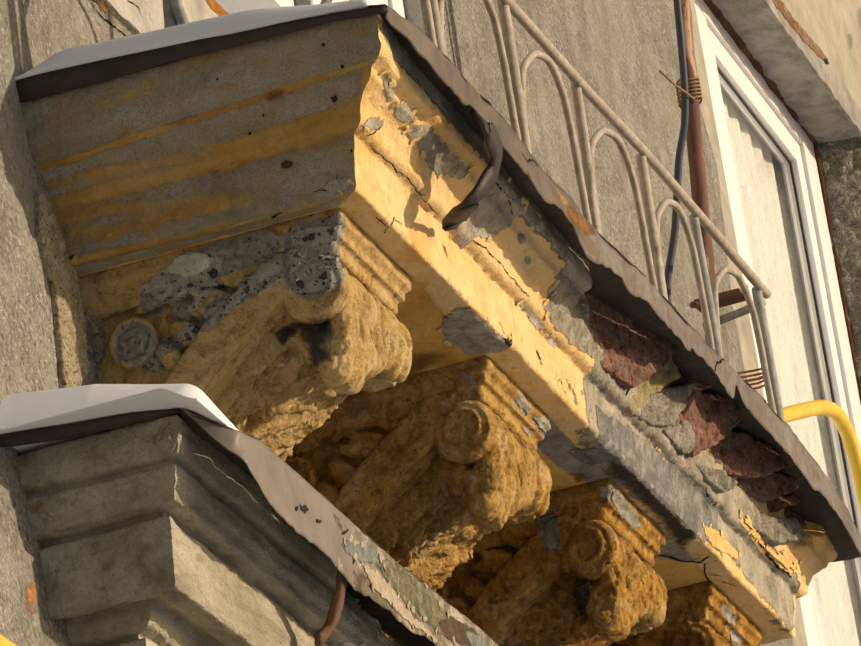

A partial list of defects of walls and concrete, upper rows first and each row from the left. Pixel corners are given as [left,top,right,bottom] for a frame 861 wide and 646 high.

flaking render [363,116,384,132]
peeling [381,70,474,180]
crack [368,127,438,215]
peeling [455,173,529,249]
spalling [138,223,343,371]
water stain [275,320,332,369]
flaking render [436,308,514,356]
crack [473,240,529,296]
spalling [516,273,826,570]
peeling [343,537,487,646]